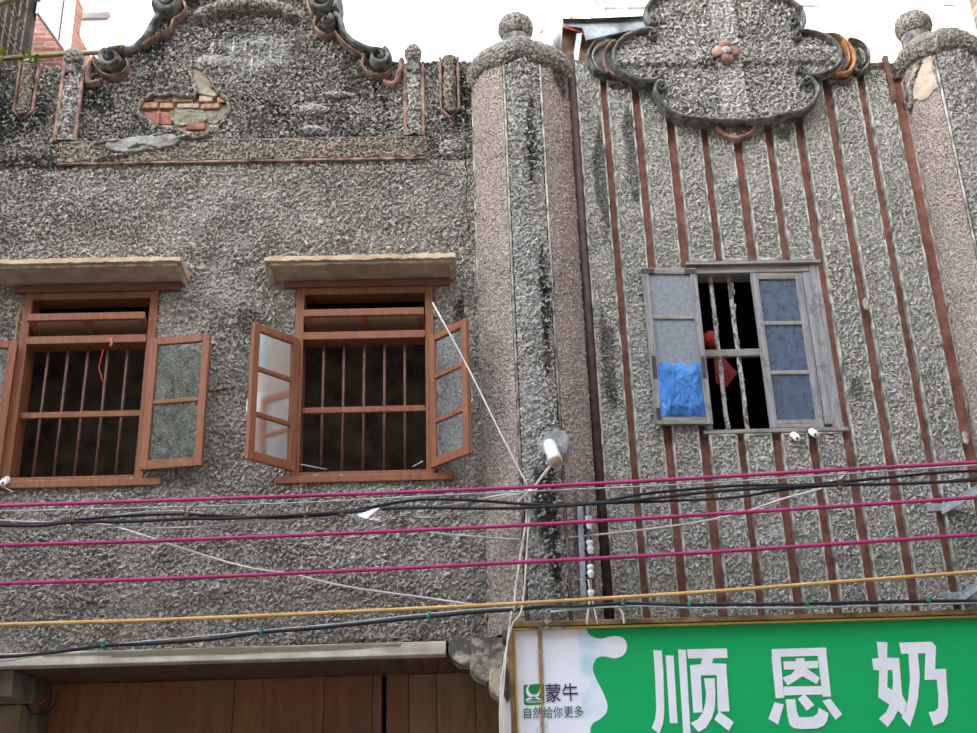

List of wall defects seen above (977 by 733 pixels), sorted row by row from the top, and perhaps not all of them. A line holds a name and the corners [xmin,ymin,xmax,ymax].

spalling [92,63,231,162]